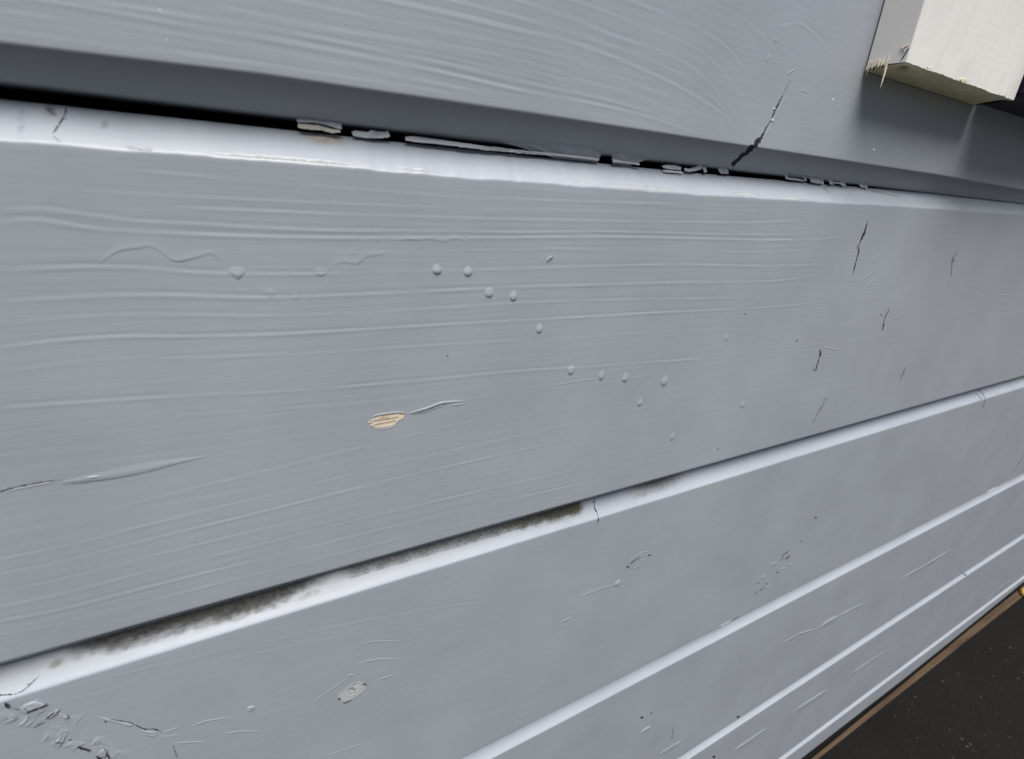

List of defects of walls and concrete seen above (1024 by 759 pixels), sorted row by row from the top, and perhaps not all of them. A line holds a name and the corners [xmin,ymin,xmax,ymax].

peeling [297,119,390,139]
peeling [405,136,646,166]
peeling [662,165,729,174]
crack [731,81,790,167]
crack [853,222,869,275]
peeling [368,412,408,430]
water stain [356,502,581,569]
water stain [75,578,311,650]
peeling [0,696,133,759]